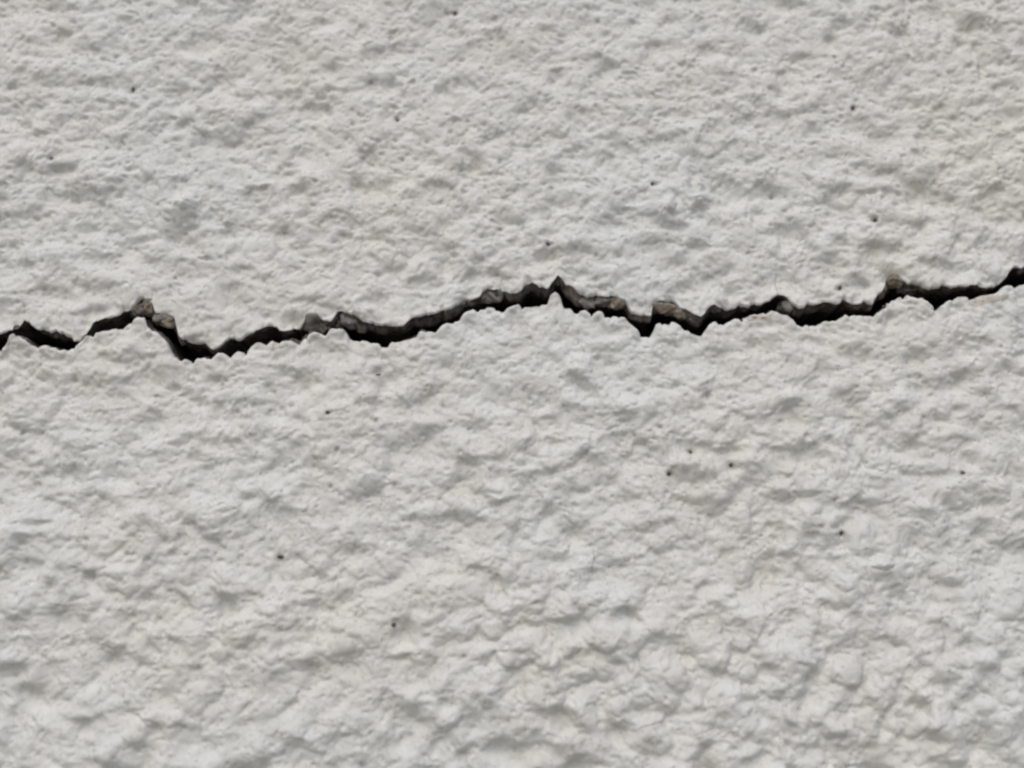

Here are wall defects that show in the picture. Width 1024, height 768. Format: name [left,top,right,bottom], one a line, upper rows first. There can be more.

crack [0,267,1024,363]